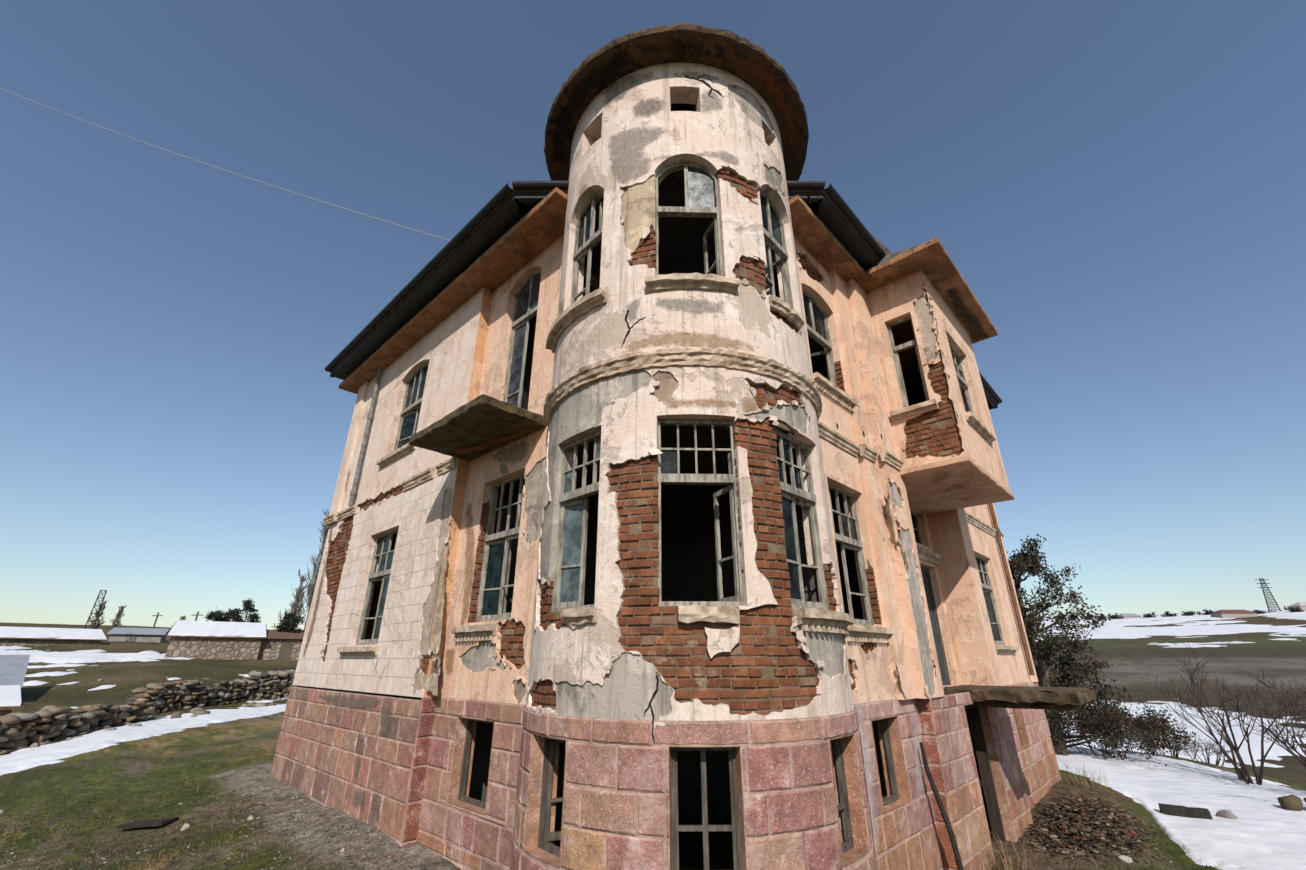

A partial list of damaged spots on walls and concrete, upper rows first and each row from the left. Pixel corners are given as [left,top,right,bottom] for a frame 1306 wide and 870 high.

crack [685,75,722,99]
flaking render [620,176,659,270]
flaking render [716,165,785,203]
flaking render [723,254,802,335]
flaking render [834,361,845,392]
flaking render [902,286,967,459]
flaking render [320,486,404,662]
flaking render [412,489,453,696]
flaking render [460,370,874,728]
flaking render [865,559,882,624]